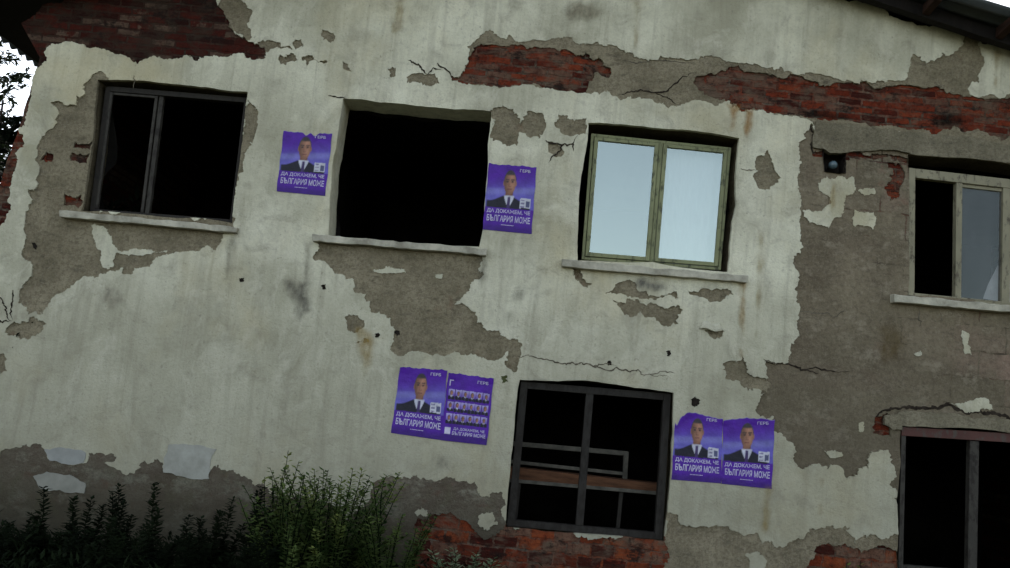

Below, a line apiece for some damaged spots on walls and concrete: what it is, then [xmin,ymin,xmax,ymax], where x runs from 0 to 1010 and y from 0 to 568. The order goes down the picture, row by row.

spalling [21,0,327,67]
spalling [388,67,439,86]
crack [622,59,690,104]
spalling [0,85,32,225]
spalling [235,100,258,195]
spalling [6,71,235,339]
spalling [451,30,1010,500]
spalling [313,243,522,383]
crack [518,355,673,378]
crack [764,359,848,374]
crack [876,402,1010,420]
spalling [0,443,898,568]